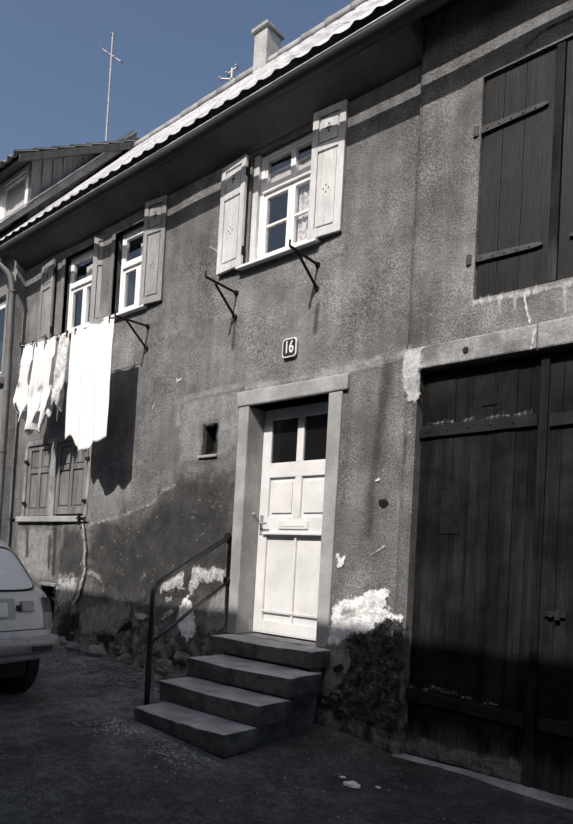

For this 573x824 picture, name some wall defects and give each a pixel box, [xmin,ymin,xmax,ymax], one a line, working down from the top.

crack [525,15,573,48]
water stain [473,280,573,349]
water stain [17,477,233,611]
flaking render [51,597,148,666]
flaking render [142,635,195,681]
flaking render [160,566,228,641]
spalling [319,588,404,733]